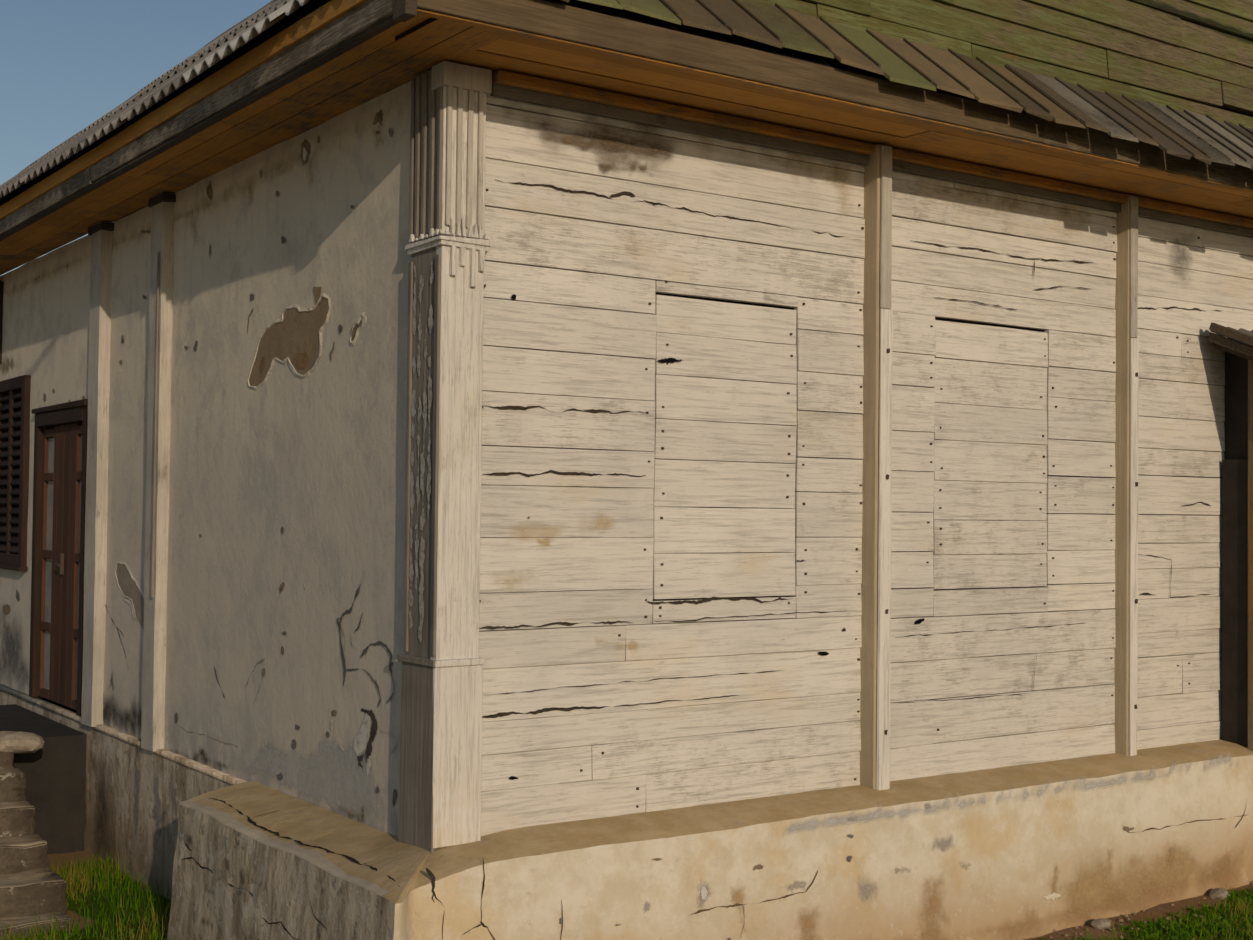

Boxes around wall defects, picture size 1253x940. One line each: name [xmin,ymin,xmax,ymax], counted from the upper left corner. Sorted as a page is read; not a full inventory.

damp [540,121,670,172]
peeling [248,287,367,391]
peeling [115,561,144,632]
crack [337,572,395,708]
crack [209,797,400,887]
crack [1123,803,1247,833]
crack [426,860,496,940]
crack [689,871,818,916]